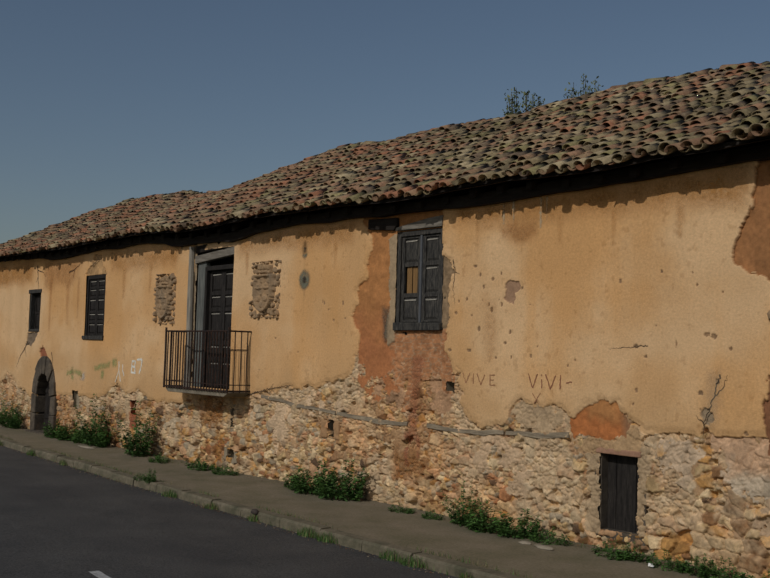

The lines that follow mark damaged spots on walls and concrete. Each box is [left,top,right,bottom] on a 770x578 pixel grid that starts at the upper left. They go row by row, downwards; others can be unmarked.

flaking render [735,160,770,280]
flaking render [52,210,770,578]
crack [697,374,728,435]